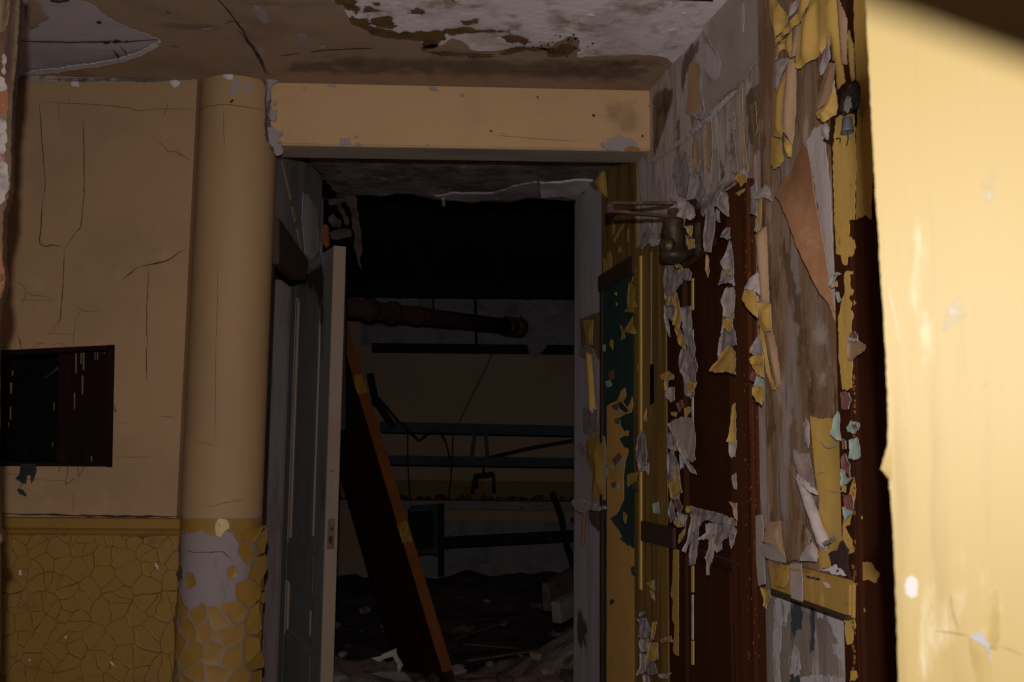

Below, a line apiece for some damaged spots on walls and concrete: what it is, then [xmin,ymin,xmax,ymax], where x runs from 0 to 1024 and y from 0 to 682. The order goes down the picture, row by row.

peeling [25,40,161,87]
crack [199,0,373,156]
crack [18,39,192,349]
crack [125,250,186,380]
peeling [640,217,660,250]
peeling [652,0,874,575]
peeling [571,270,650,546]
crack [0,535,233,682]
peeling [174,518,268,682]
peeling [636,611,673,682]
peeling [755,514,865,682]
peeling [862,562,880,583]